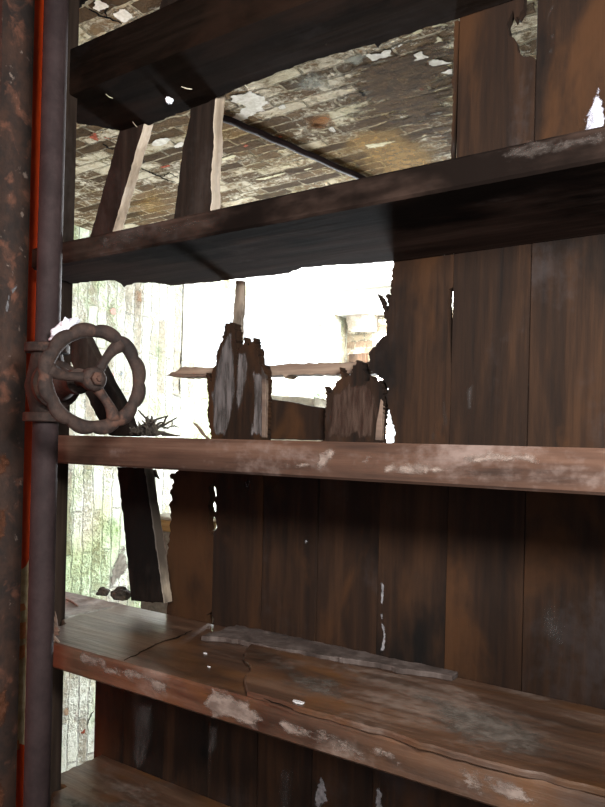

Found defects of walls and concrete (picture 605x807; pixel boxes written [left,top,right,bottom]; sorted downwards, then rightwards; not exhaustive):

peeling [93,0,132,23]
flaking render [332,24,457,153]
peeling [231,91,269,121]
peeling [586,88,604,130]
crack [125,630,192,660]